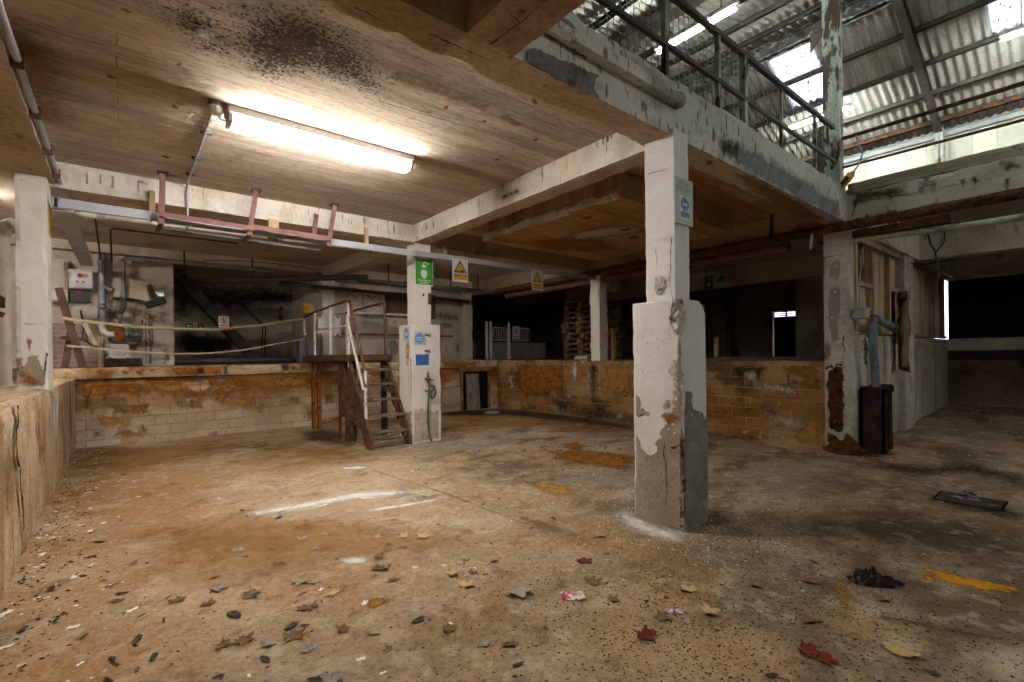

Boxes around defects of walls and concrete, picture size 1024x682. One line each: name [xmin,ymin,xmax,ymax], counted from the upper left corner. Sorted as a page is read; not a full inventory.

water stain [143,0,488,111]
crack [14,405,25,543]
peeling [21,353,45,386]
water stain [296,411,348,446]
water stain [441,363,631,429]
peeling [635,359,708,530]